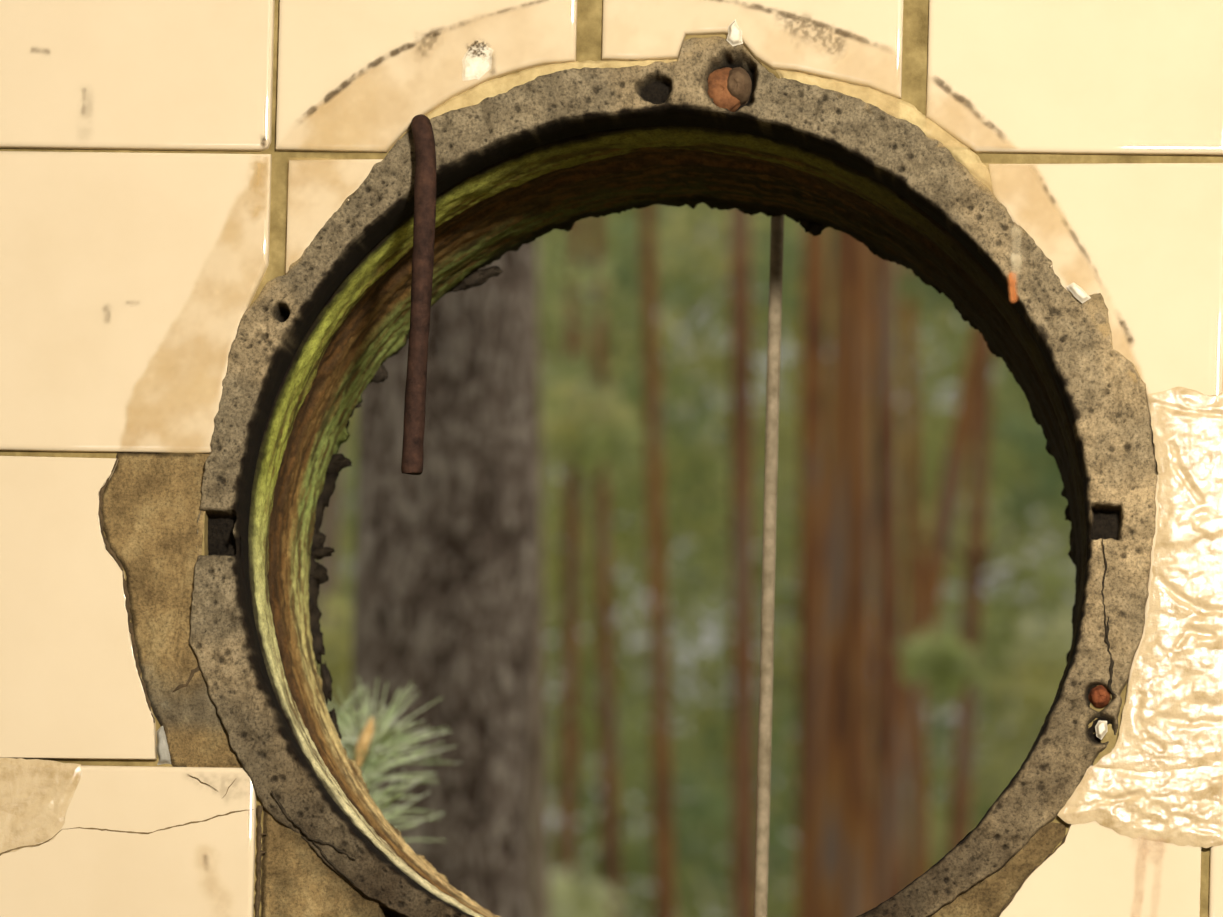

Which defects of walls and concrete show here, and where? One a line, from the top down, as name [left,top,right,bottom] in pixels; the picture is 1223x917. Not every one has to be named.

peeling [462,41,494,81]
peeling [727,20,743,46]
peeling [799,218,826,236]
peeling [451,266,503,292]
peeling [1067,282,1091,303]
spalling [98,452,243,768]
peeling [308,454,352,741]
crack [1101,537,1117,696]
peeling [1095,720,1108,740]
crack [0,791,361,887]
spalling [254,805,406,917]
spalling [930,822,1070,917]